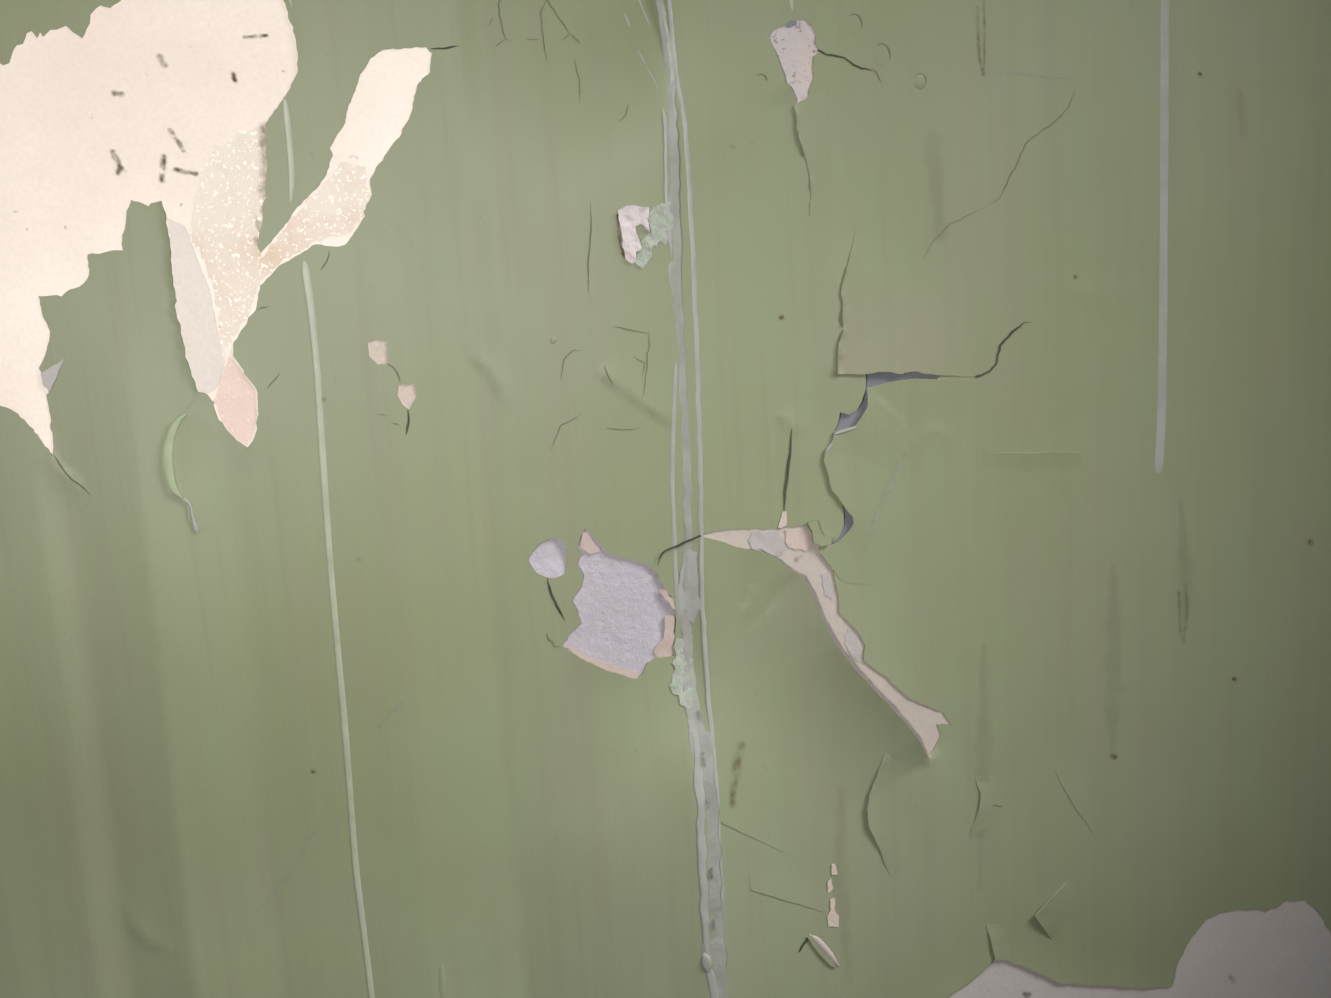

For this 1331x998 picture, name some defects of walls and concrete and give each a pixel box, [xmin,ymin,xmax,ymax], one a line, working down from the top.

peeling [0,0,432,534]
flaking render [617,202,674,269]
peeling [769,19,844,216]
crack [923,91,1075,261]
crack [975,322,1030,378]
peeling [704,223,989,756]
flaking render [529,529,676,679]
peeling [949,900,1331,998]